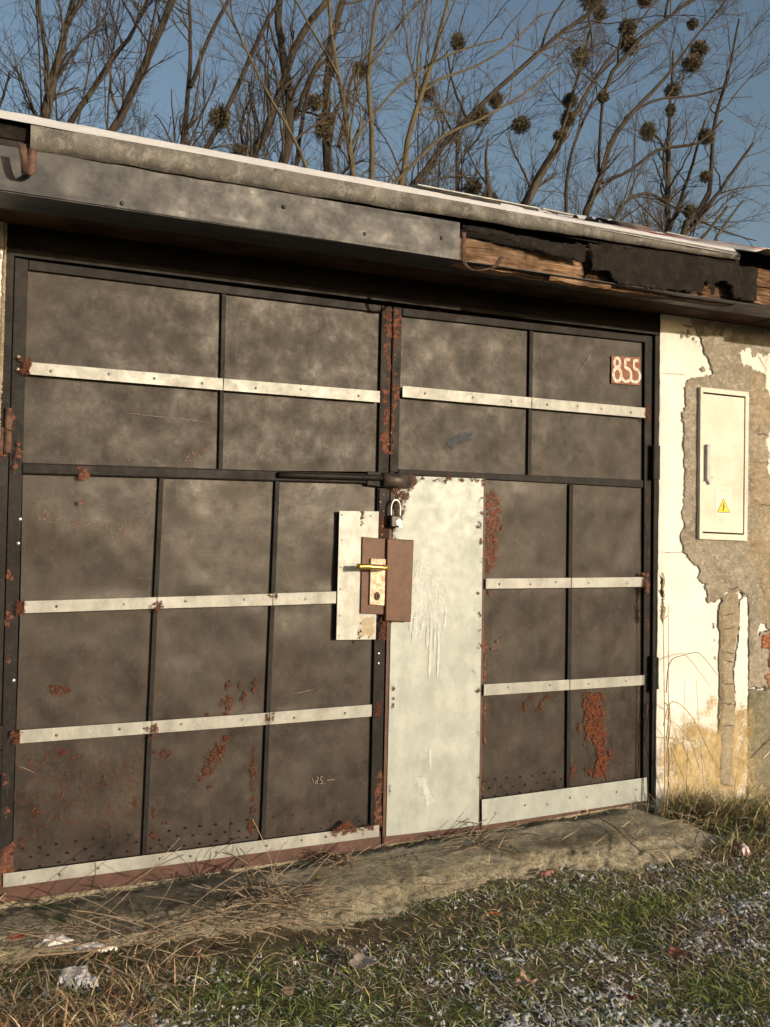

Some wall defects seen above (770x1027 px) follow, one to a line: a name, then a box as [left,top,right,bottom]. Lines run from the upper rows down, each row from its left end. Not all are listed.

spalling [0,222,8,428]
rust [380,309,456,463]
rust [378,476,506,574]
spalling [680,319,770,799]
rust [143,720,172,760]
rust [205,677,259,717]
rust [330,764,391,836]
rust [570,692,614,779]
damp [659,696,762,809]